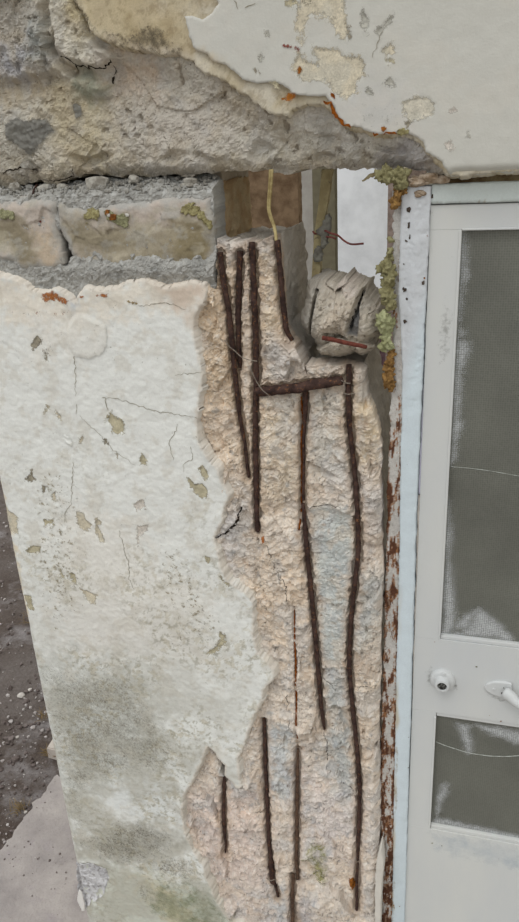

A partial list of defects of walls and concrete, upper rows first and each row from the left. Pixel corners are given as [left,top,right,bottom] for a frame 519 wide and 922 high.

crack [61,56,117,84]
spalling [0,0,444,188]
corrosion [42,291,69,316]
peeling [104,412,125,445]
peeling [25,469,58,501]
peeling [5,503,19,534]
peeling [76,512,105,542]
crack [215,507,242,538]
peeling [59,570,98,605]
spalling [186,233,386,922]
corrosion [380,206,403,922]